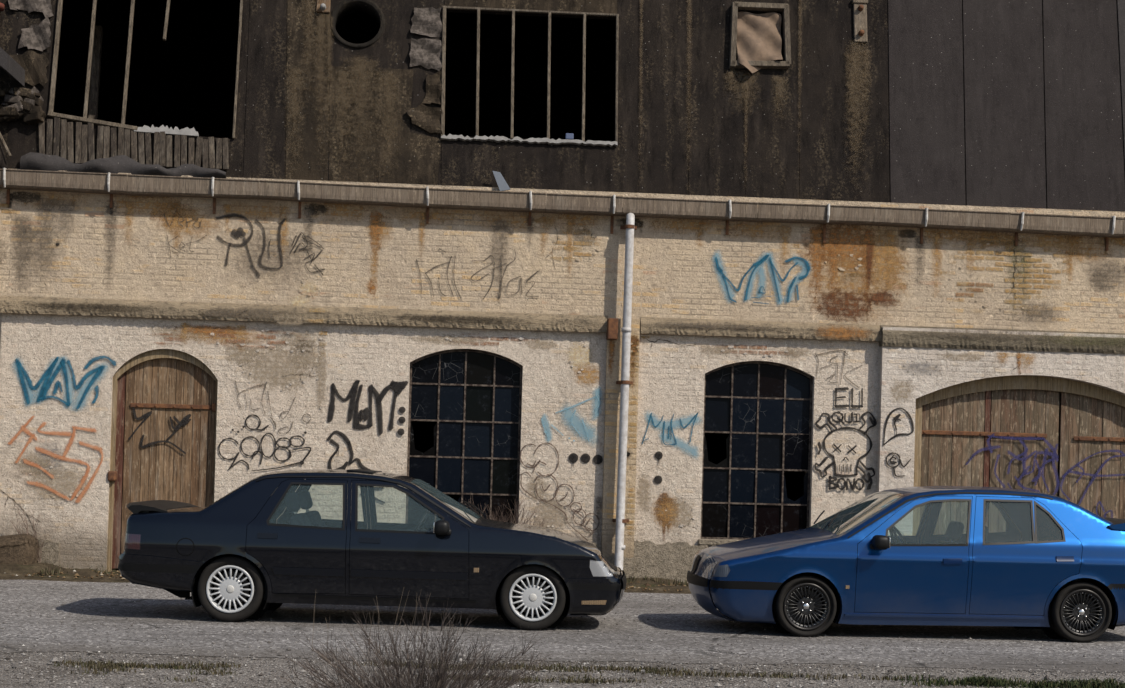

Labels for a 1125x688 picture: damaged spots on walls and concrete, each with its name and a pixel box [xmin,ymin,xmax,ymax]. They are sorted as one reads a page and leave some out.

damp [9,192,74,276]
corrosion [316,203,454,292]
corrosion [806,224,904,321]
corrosion [919,228,1125,286]
corrosion [656,493,677,535]